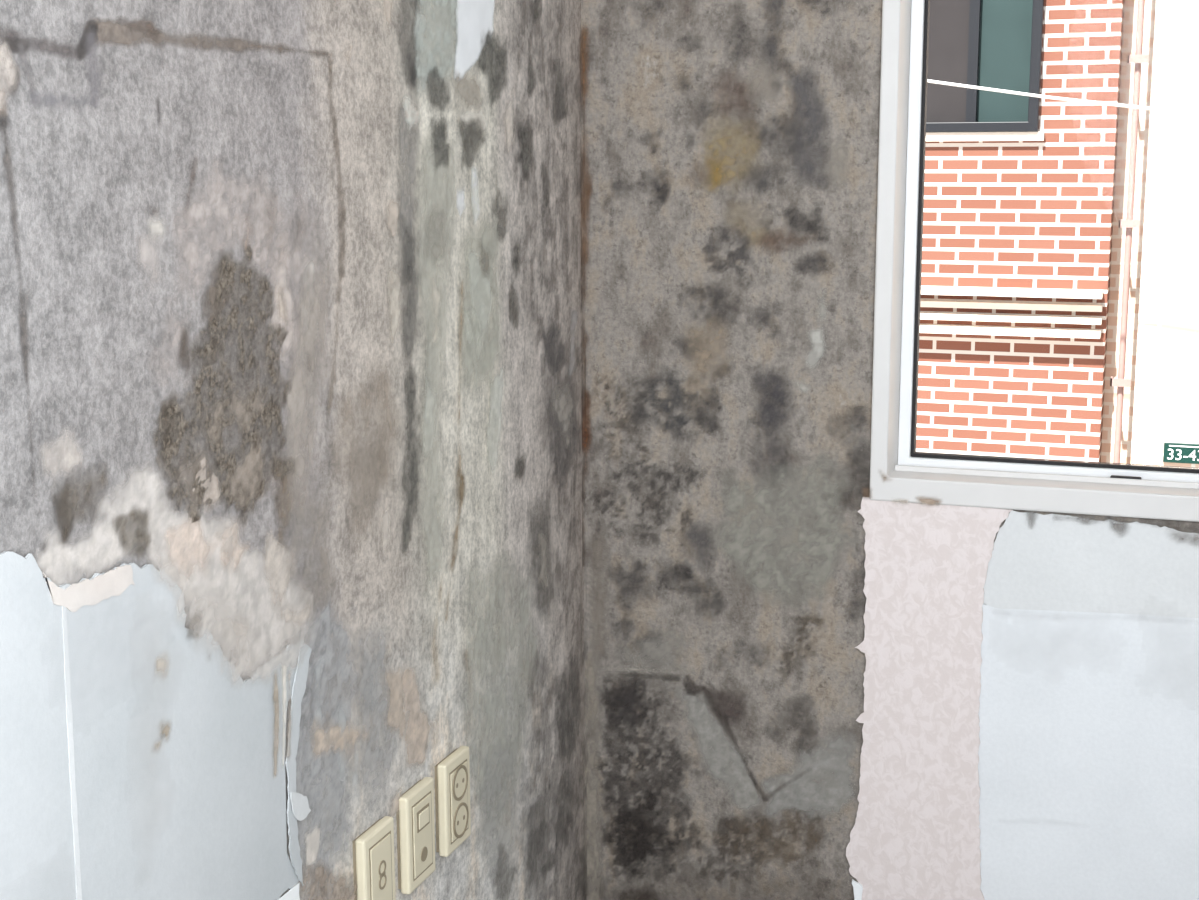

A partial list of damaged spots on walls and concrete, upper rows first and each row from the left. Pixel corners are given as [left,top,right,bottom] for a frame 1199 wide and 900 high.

crack [0,20,331,103]
water stain [405,0,507,166]
crack [4,133,17,232]
flaking render [388,203,399,235]
rust [580,158,591,221]
crack [20,310,28,379]
water stain [346,107,418,552]
flaking render [389,272,400,338]
rust [581,391,591,453]
water stain [605,378,721,436]
flaking render [37,178,393,900]
water stain [596,675,821,881]